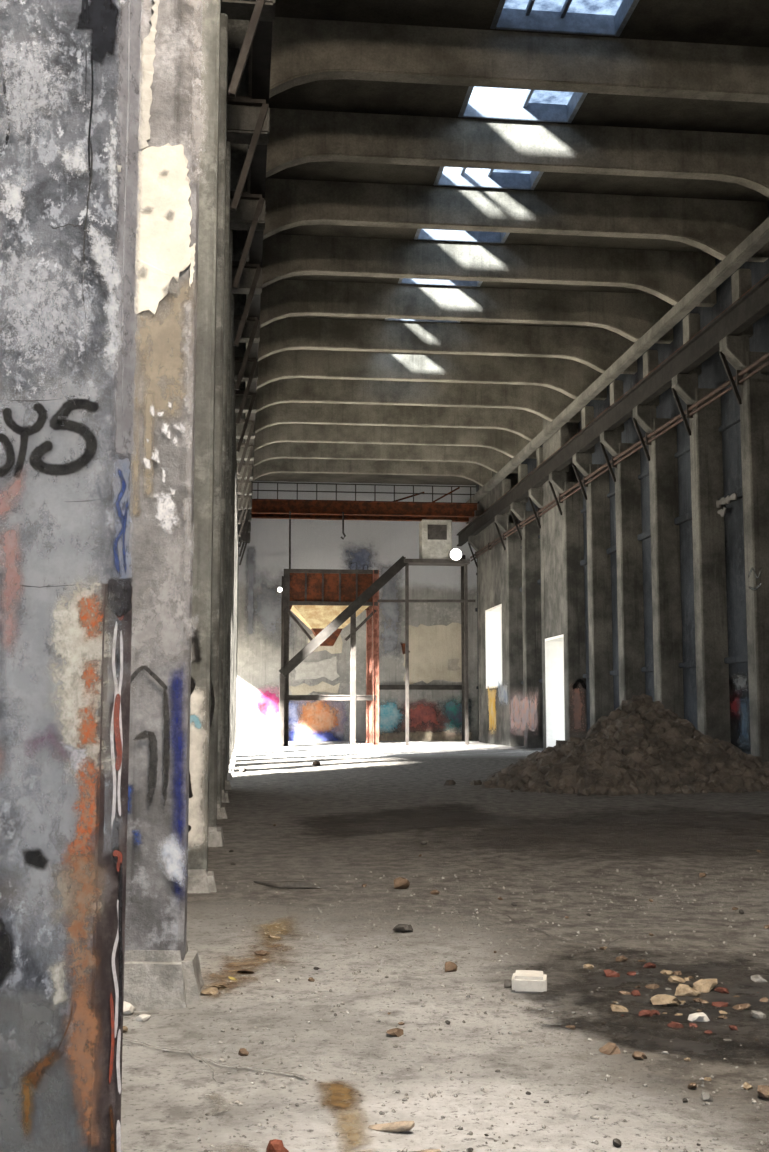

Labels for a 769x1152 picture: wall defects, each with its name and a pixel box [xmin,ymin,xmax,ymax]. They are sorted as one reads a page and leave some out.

peeling [0,0,196,534]
peeling [50,581,113,782]
corrosion [78,594,103,639]
peeling [49,961,67,1005]
corrosion [21,660,104,1143]